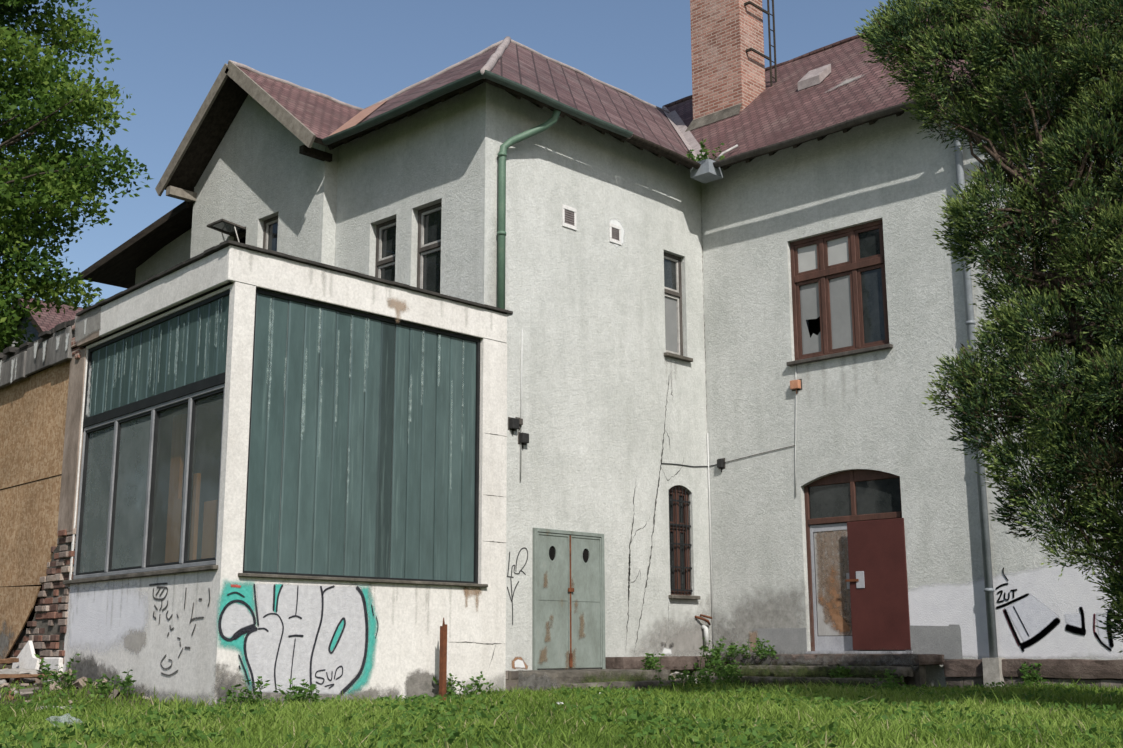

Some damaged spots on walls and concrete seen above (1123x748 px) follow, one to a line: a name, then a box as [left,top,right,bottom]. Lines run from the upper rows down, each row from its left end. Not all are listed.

rust [388,299,406,316]
crack [626,375,684,651]
rust [815,530,852,635]
rust [539,616,553,663]